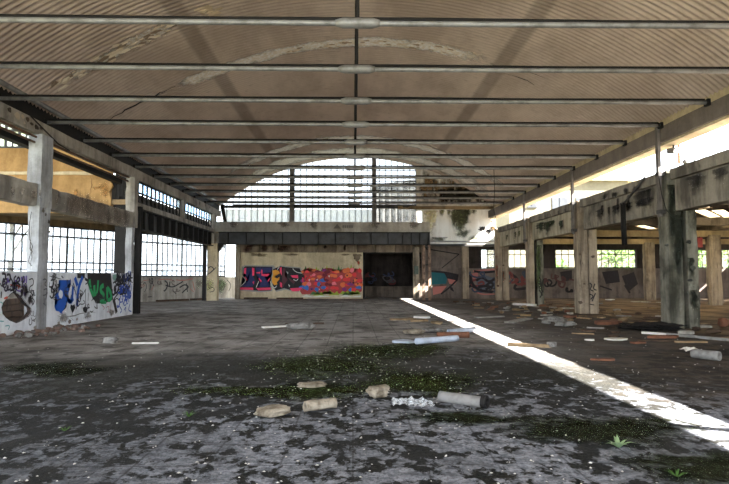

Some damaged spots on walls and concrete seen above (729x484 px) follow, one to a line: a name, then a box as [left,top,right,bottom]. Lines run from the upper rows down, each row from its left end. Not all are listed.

peeling [47,24,177,92]
crack [111,86,176,119]
leakage [233,135,502,229]
leakage [713,166,728,178]
leakage [596,189,652,218]
leakage [536,220,563,232]
leakage [667,185,695,283]
leakage [690,290,698,310]